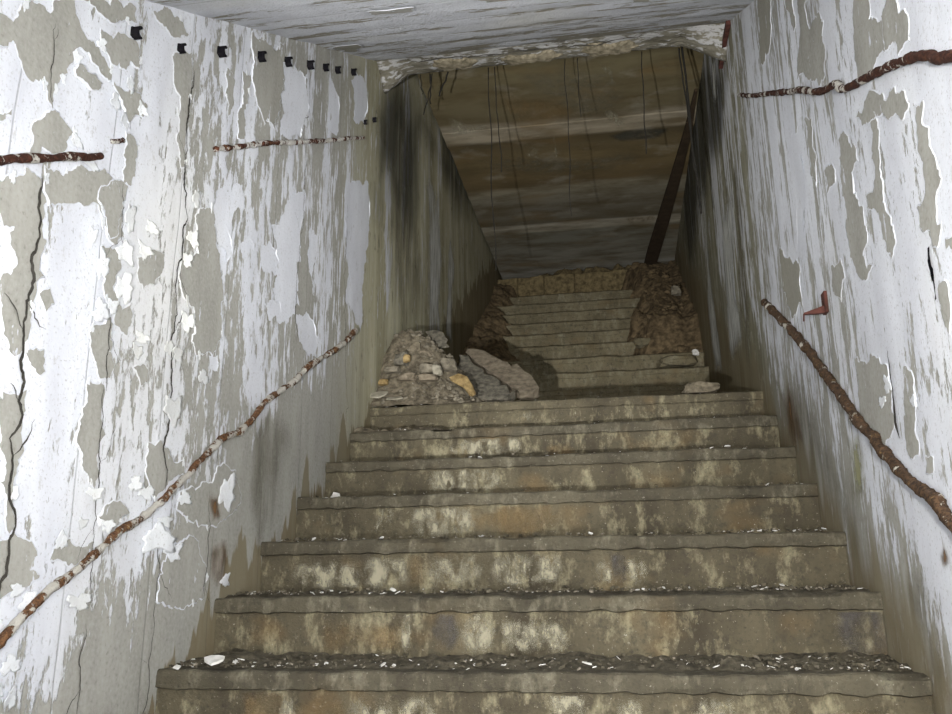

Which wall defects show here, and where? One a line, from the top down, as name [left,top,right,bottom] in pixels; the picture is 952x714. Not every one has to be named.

peeling [225,30,286,141]
peeling [784,0,826,87]
peeling [852,0,910,78]
peeling [0,0,189,534]
peeling [164,190,224,384]
water stain [381,93,417,263]
water stain [428,186,454,339]
peeling [804,85,952,302]
crack [0,178,45,591]
peeling [0,382,94,611]
peeling [142,462,241,610]
peeling [854,353,935,475]